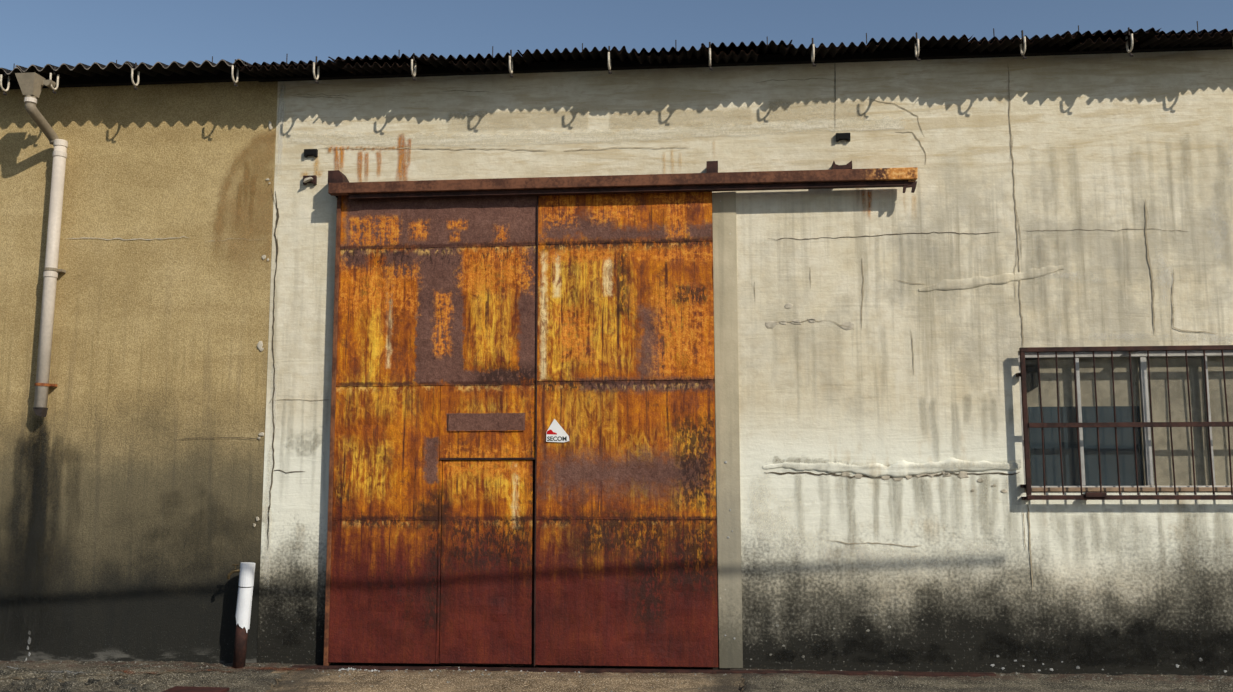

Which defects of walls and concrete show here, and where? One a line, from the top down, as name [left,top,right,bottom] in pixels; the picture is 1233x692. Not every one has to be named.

corrosion [329,147,381,180]
corrosion [393,136,411,181]
leakage [981,621,1233,671]